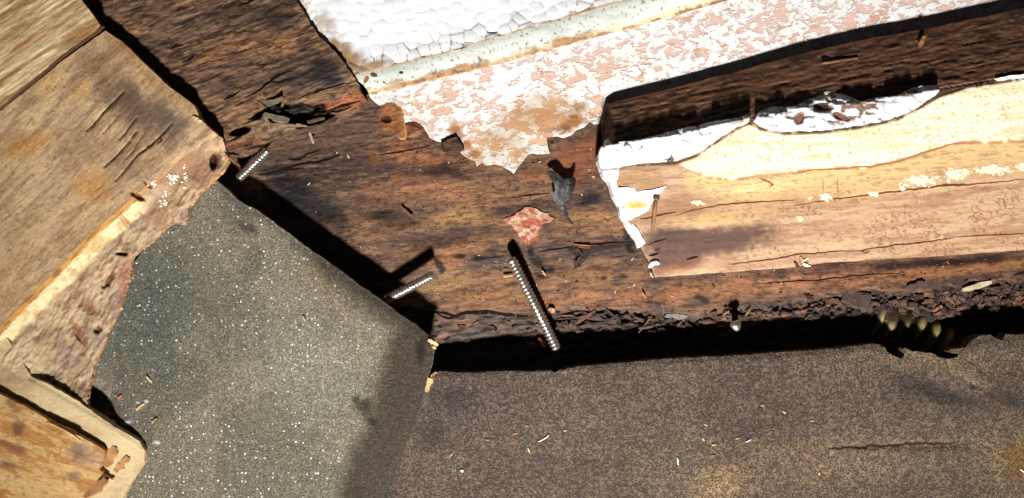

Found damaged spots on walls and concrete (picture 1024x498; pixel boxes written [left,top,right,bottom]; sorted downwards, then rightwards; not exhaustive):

crack [87,91,124,130]
spalling [256,96,330,128]
crack [107,117,171,180]
crack [539,143,1021,256]
crack [731,233,1018,284]